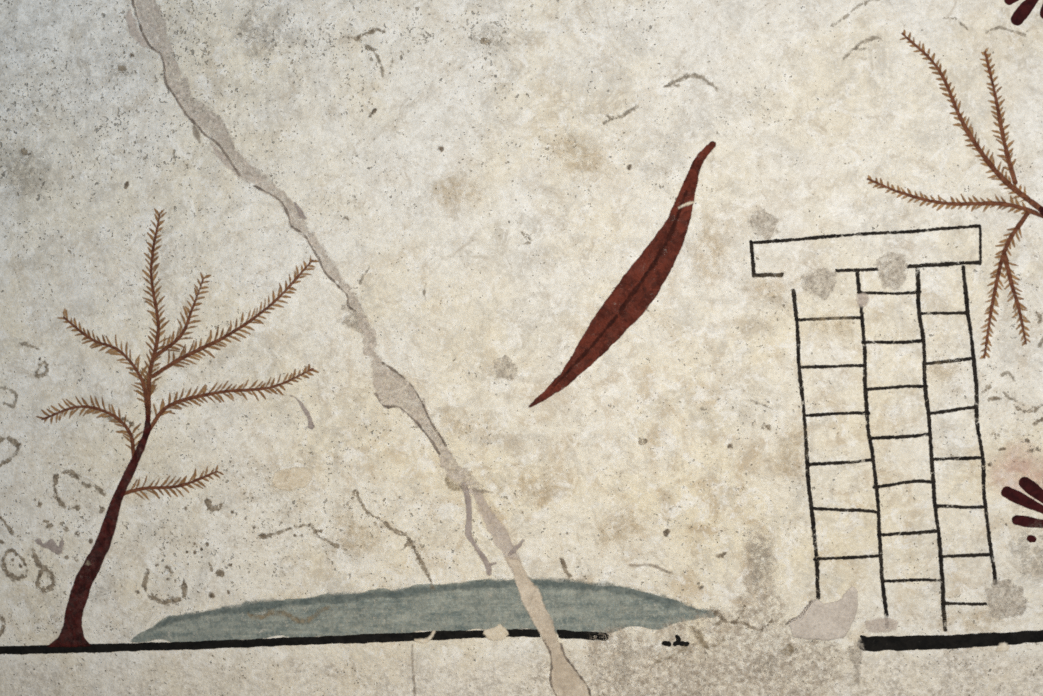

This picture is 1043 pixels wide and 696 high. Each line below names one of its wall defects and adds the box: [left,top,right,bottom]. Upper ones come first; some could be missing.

crack [126,0,591,696]
peeling [483,624,508,640]
spalling [589,534,864,696]